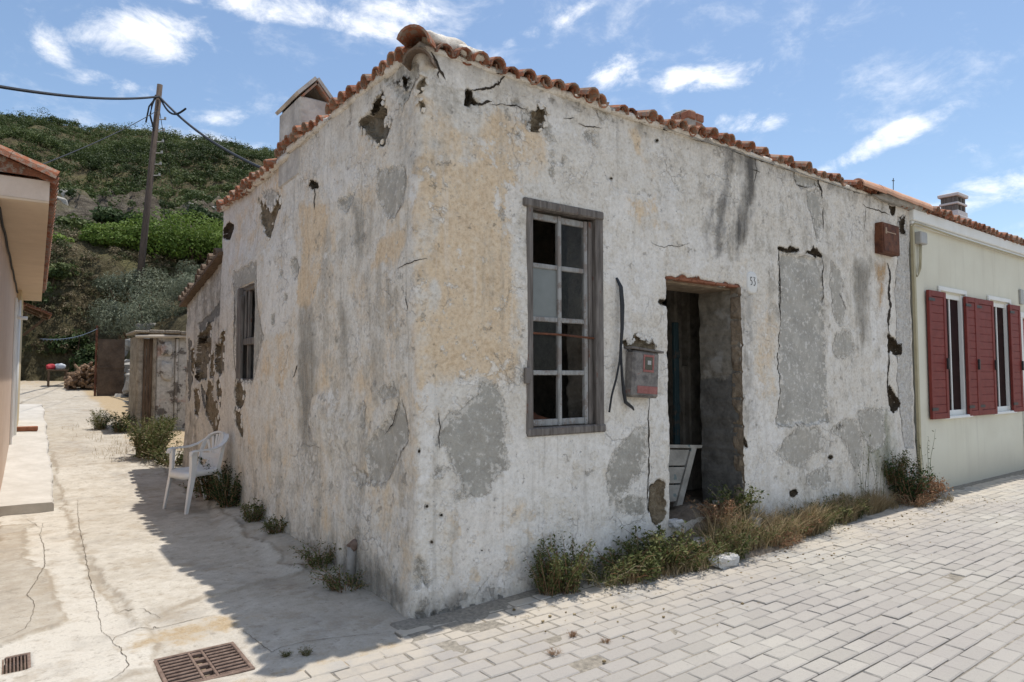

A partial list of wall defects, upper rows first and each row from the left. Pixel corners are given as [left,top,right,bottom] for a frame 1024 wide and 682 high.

spalling [358,60,429,148]
crack [464,76,527,110]
spalling [516,101,567,183]
spalling [257,189,282,240]
leakage [737,156,755,244]
peeling [188,261,275,441]
crack [887,263,902,413]
spalling [888,204,914,448]
peeling [351,381,409,489]
peeling [433,378,511,500]
peeling [606,422,649,516]
crack [647,398,667,525]